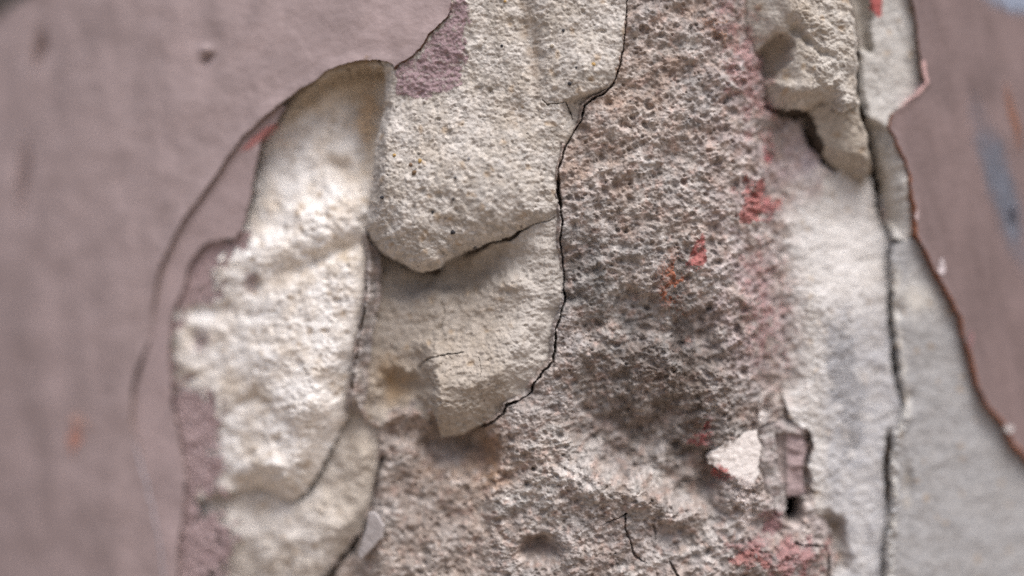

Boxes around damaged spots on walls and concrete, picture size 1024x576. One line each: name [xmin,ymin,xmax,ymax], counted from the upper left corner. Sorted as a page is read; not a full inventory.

flaking render [170,16,449,576]
crack [463,228,528,256]
crack [476,91,607,428]
peeling [720,475,763,527]
peeling [739,198,757,223]
flaking render [751,170,904,576]
crack [856,54,883,228]
crack [882,289,902,508]